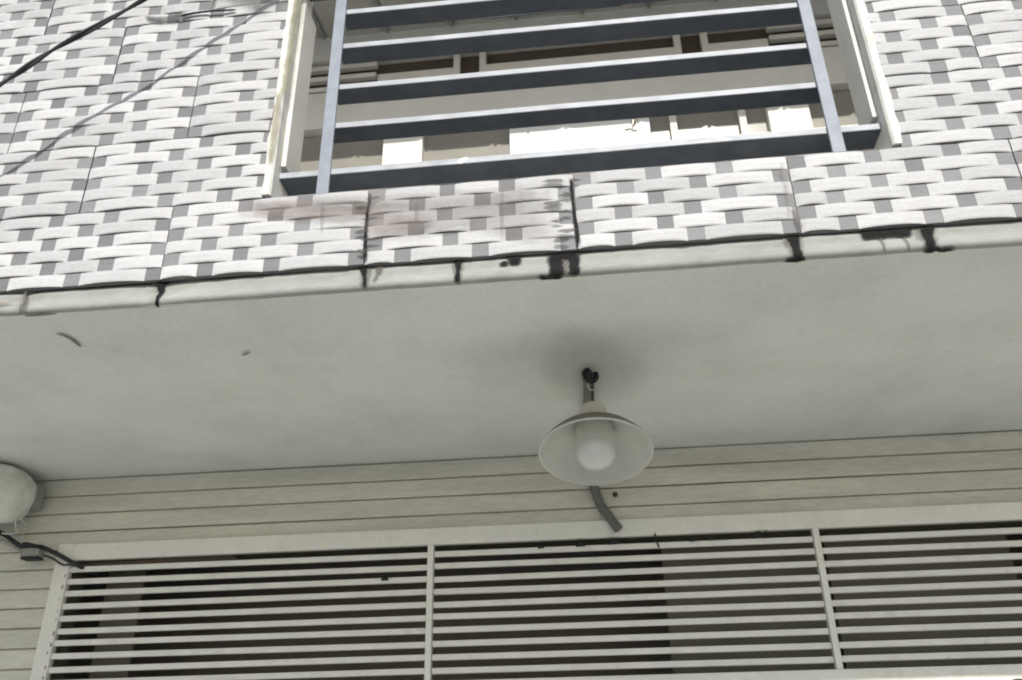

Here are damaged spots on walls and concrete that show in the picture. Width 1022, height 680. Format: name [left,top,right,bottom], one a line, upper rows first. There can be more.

leakage [539,179,581,280]
leakage [785,235,805,263]
leakage [861,226,954,253]